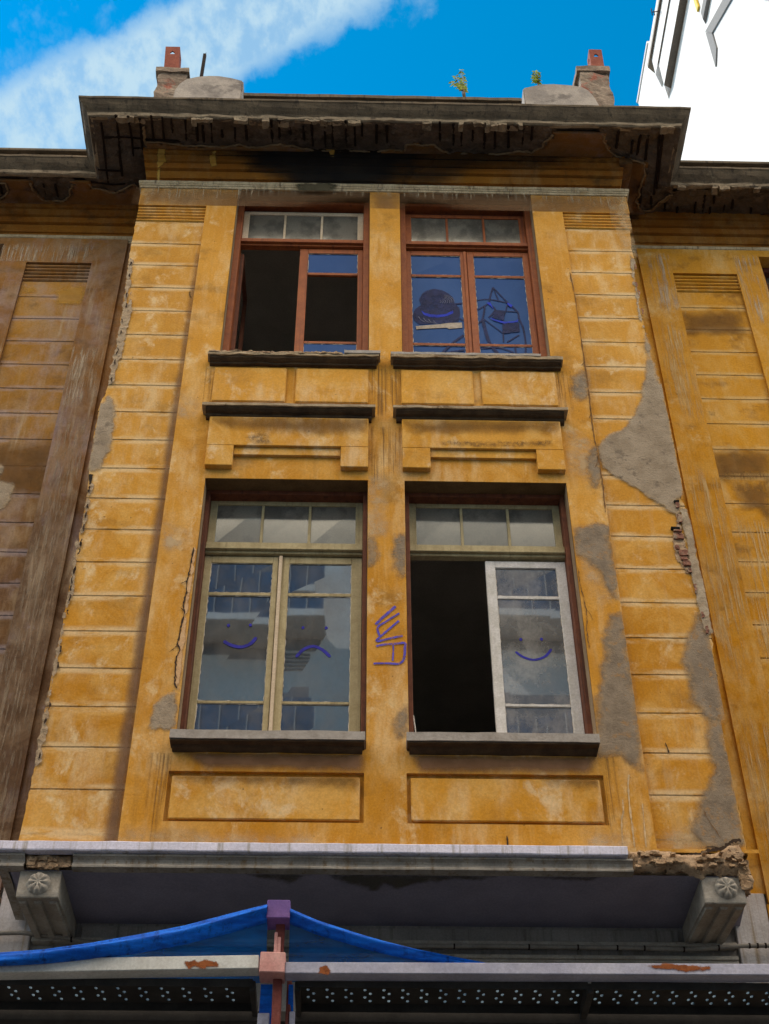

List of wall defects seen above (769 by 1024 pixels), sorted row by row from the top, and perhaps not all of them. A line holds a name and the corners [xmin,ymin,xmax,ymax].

flaking render [35,258,134,766]
flaking render [150,547,196,730]
crack [169,547,194,688]
flaking render [574,256,769,849]
spalling [26,855,72,871]
corrosion [185,960,218,969]
corrosion [651,963,710,972]